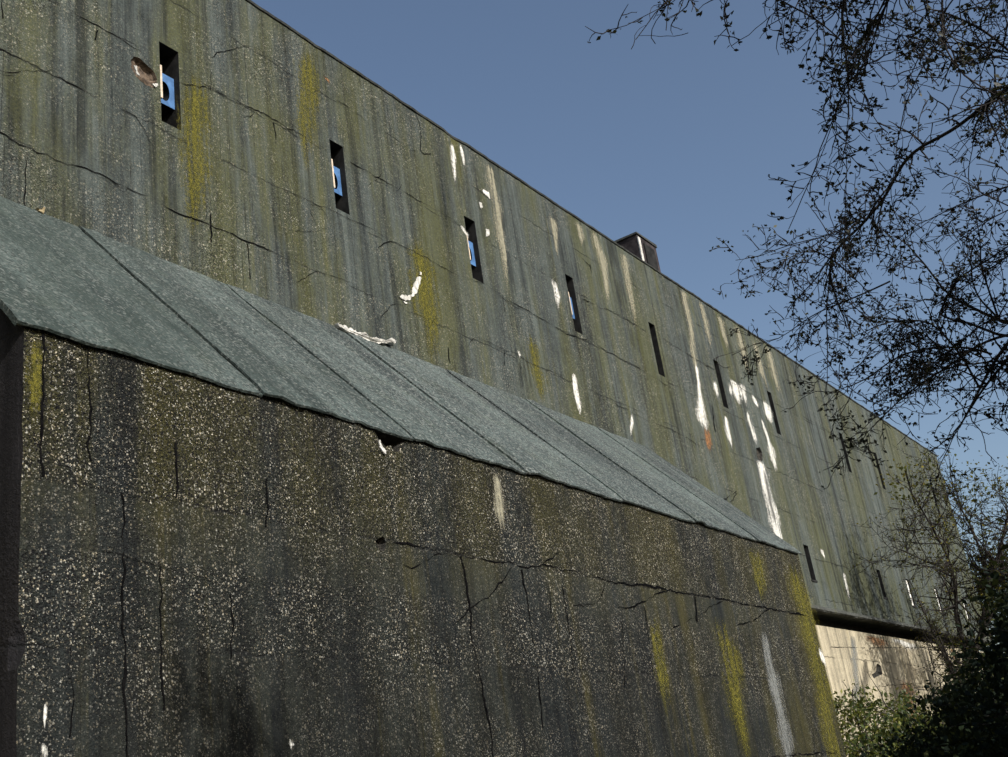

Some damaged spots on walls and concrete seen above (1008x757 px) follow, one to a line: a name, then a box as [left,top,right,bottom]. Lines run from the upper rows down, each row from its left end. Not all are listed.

crack [0,49,84,90]
spalling [131,56,158,88]
crack [0,131,287,279]
damp [451,146,465,180]
crack [39,330,47,477]
damp [494,476,504,525]
damp [572,374,581,413]
damp [682,292,779,429]
damp [713,381,782,538]
crack [47,493,165,757]
crack [391,541,809,757]
damp [763,636,792,757]